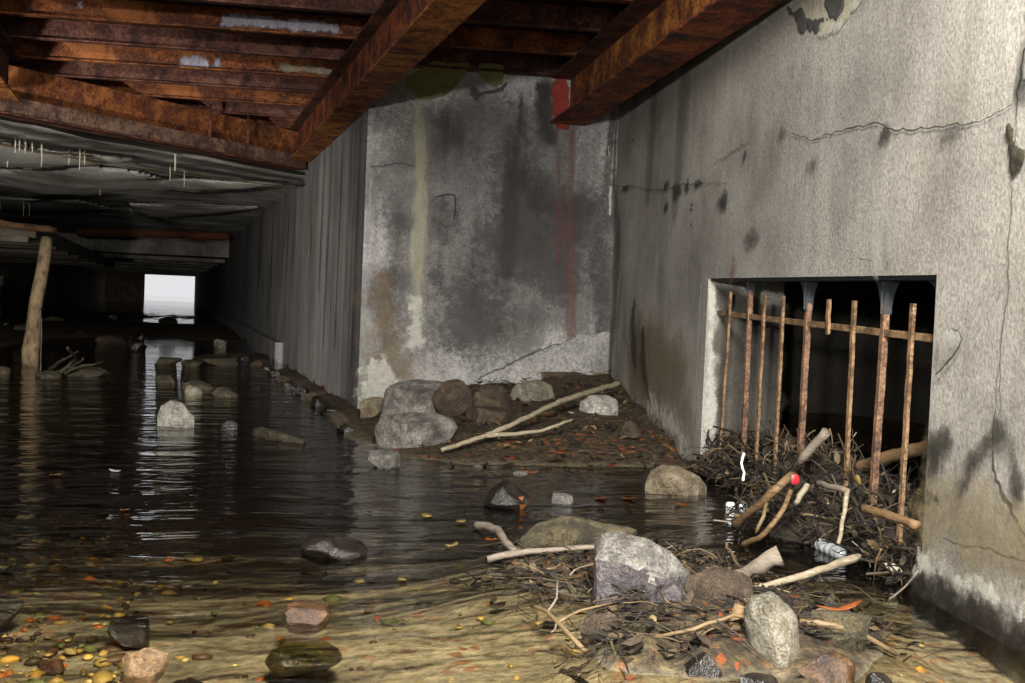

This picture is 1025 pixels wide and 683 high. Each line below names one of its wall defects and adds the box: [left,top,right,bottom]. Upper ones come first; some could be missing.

peeling [787,0,861,36]
water stain [535,80,557,144]
corrosion [551,79,569,129]
crack [792,48,1025,144]
crack [615,141,749,191]
water stain [405,296,426,350]
crack [943,174,1025,561]
water stain [910,483,1025,670]